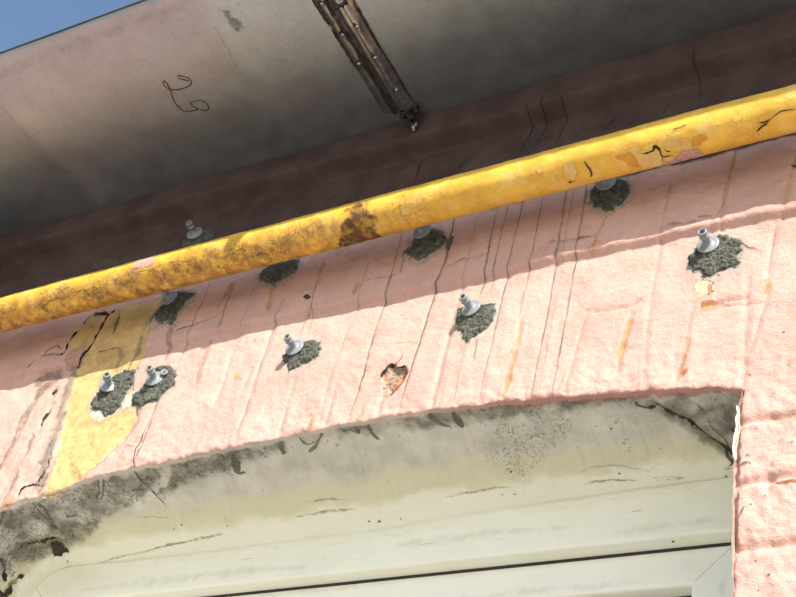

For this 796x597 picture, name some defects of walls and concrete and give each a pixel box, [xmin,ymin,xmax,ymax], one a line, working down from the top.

peeling [694,279,714,295]
water stain [0,372,77,489]
crack [18,310,117,562]
peeling [43,296,164,498]
water stain [340,425,380,440]
spalling [381,353,408,397]
water stain [406,412,464,428]
crack [635,398,751,470]
water stain [702,405,736,457]
water stain [171,451,245,487]
water stain [0,507,89,567]